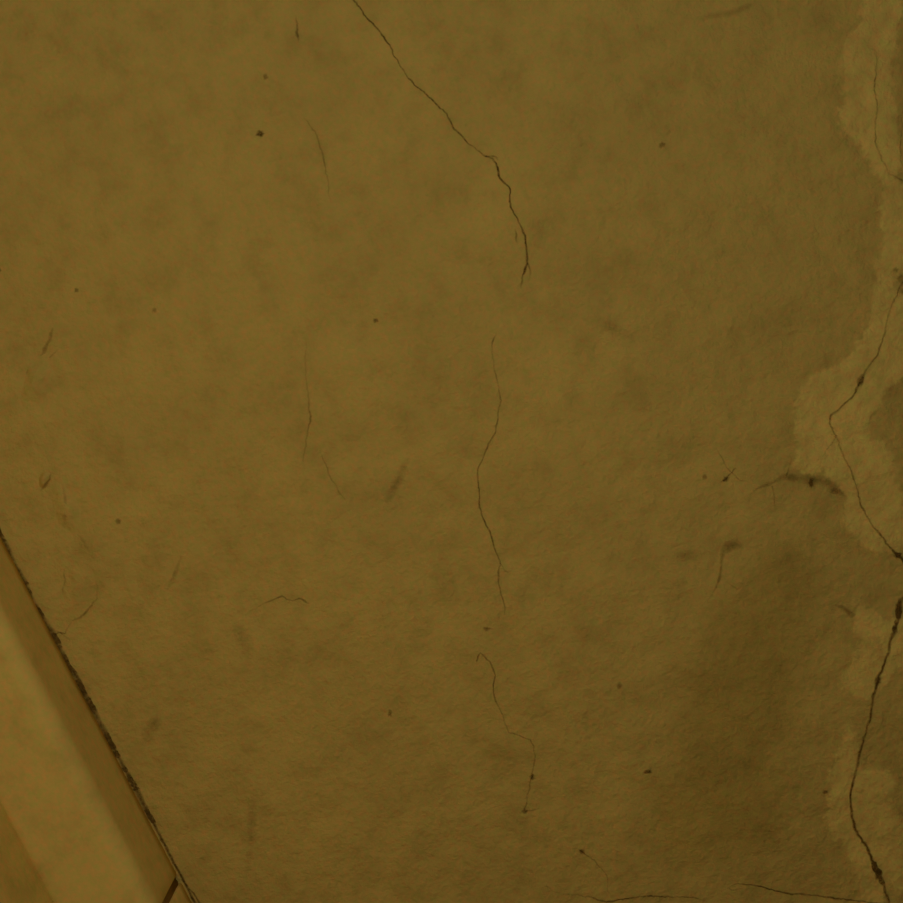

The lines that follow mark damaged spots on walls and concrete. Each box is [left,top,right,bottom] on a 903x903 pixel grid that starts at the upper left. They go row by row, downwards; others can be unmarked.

crack [486,156,528,274]
crack [879,533,903,562]
crack [0,529,199,903]
crack [827,601,902,903]